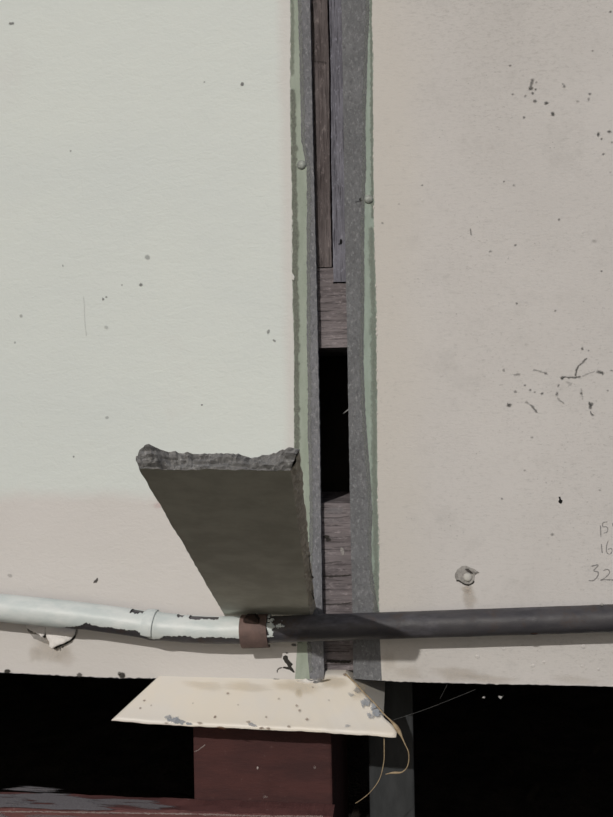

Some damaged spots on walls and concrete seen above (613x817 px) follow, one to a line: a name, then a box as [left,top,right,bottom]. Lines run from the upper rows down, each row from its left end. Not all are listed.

peeling [25,625,78,651]